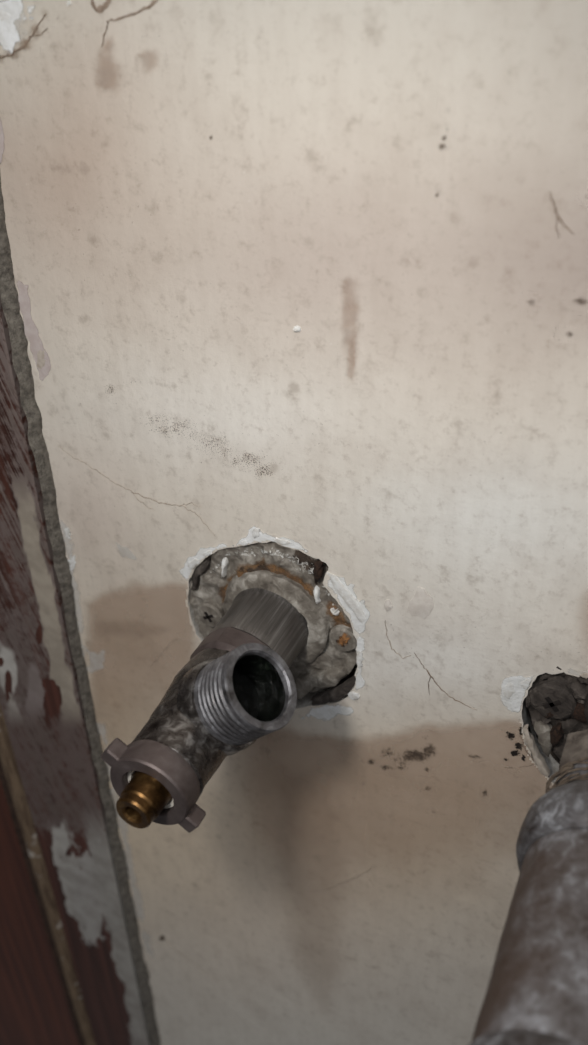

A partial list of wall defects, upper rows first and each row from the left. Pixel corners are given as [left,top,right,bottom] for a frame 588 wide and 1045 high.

peeling [0,0,35,53]
peeling [17,281,51,380]
crack [58,446,215,536]
flaking render [179,526,308,579]
corrosion [220,561,313,602]
flaking render [302,572,370,721]
corrosion [327,602,351,644]
crack [385,620,476,710]
flaking render [500,675,532,712]